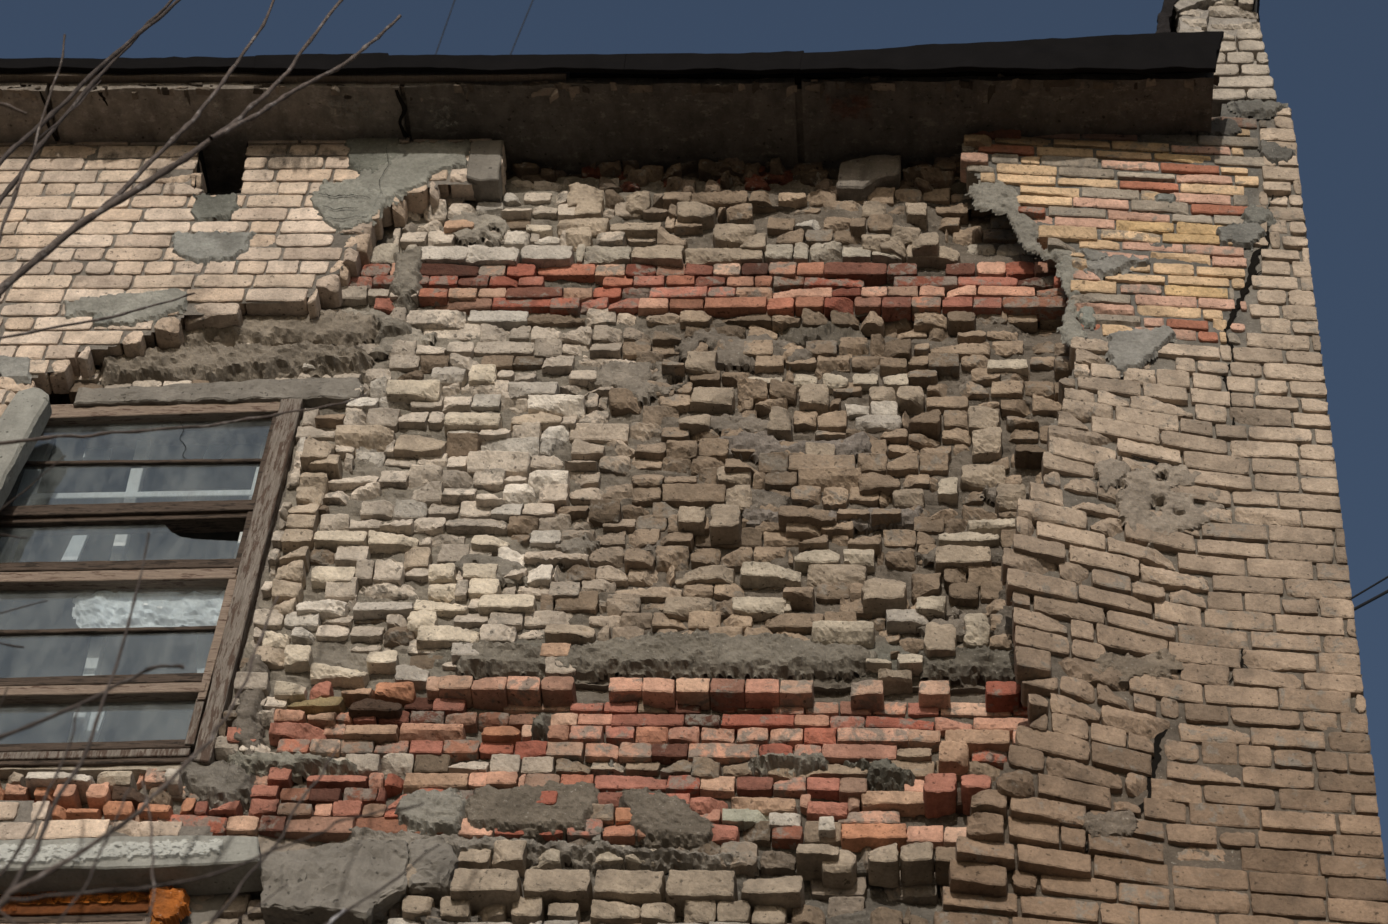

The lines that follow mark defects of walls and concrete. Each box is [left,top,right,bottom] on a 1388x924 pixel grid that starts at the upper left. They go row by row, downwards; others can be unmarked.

crack [1221,195,1274,425]
spalling [0,137,1073,924]
crack [1135,729,1168,818]